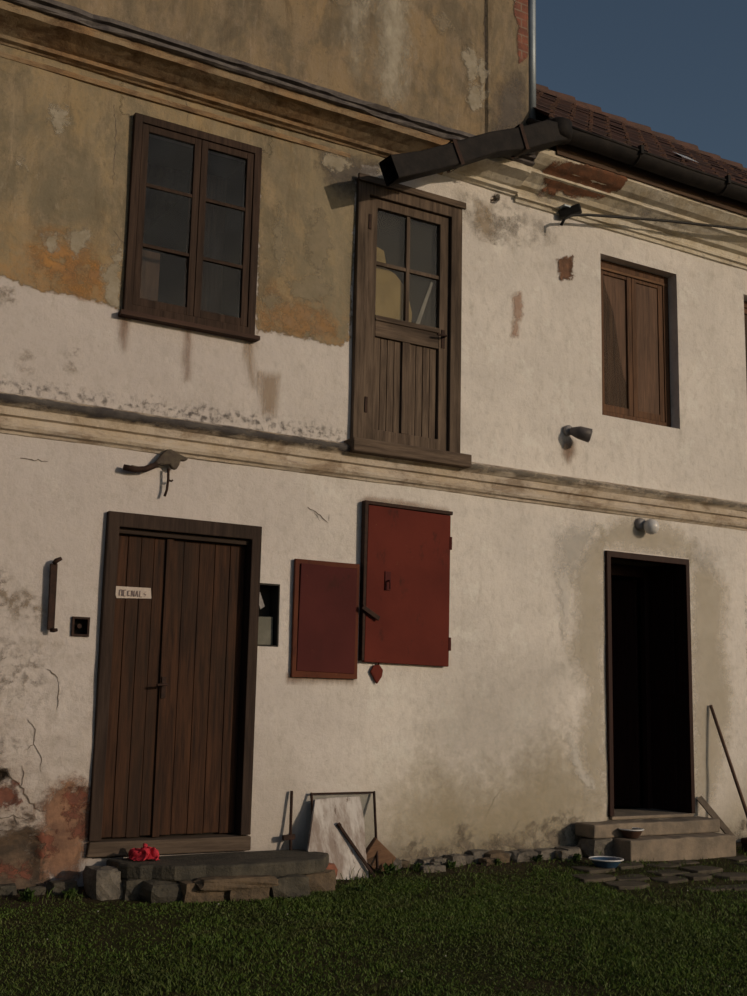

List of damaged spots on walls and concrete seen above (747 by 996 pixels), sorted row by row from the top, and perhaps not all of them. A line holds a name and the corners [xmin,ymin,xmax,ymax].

water stain [351,0,408,99]
peeling [461,47,490,112]
spalling [514,0,529,64]
peeling [0,44,385,347]
spalling [538,159,628,200]
spalling [556,255,574,281]
crack [0,720,47,821]
spalling [0,768,91,891]